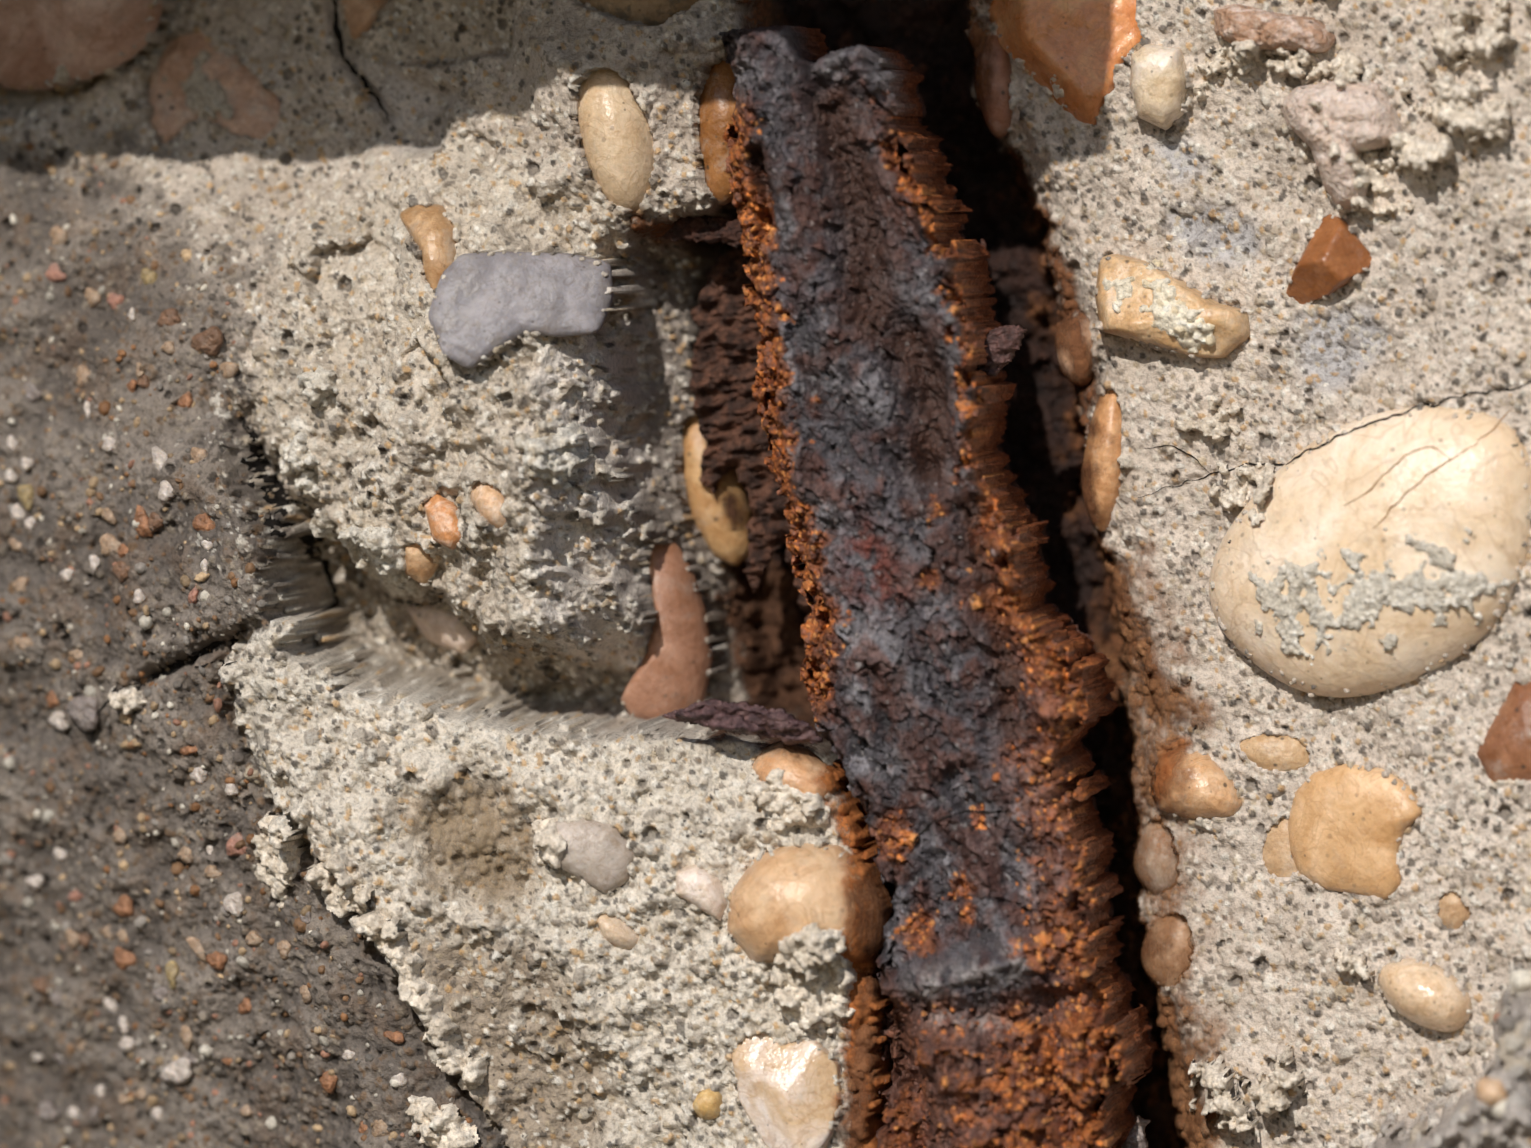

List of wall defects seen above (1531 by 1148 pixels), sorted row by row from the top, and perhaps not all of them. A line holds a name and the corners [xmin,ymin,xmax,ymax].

crack [90,630,246,742]
spalling [0,0,870,1148]
corrosion [630,107,895,1148]
corrosion [964,0,992,120]
corrosion [875,130,1219,1148]
crack [1138,381,1531,528]